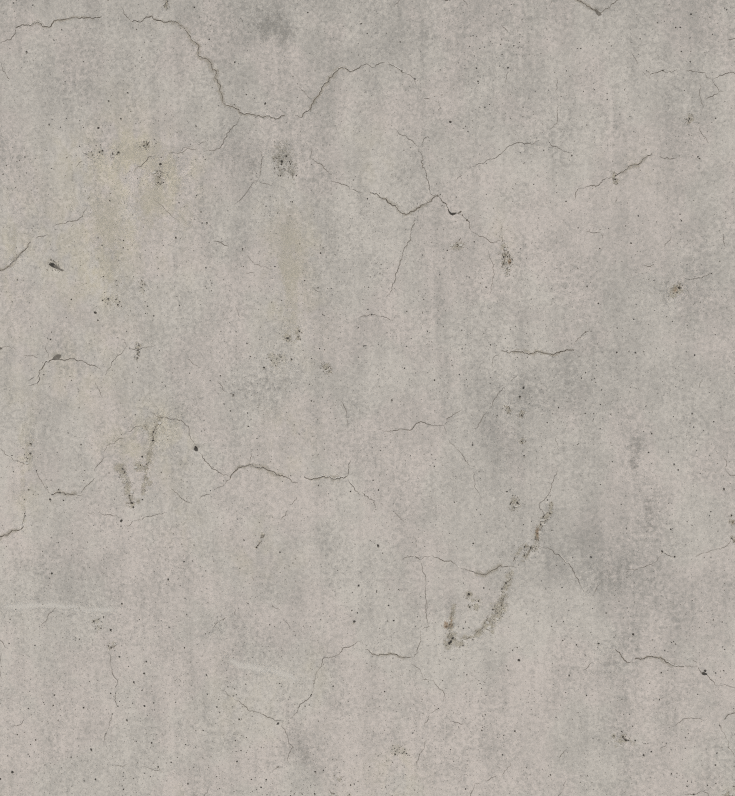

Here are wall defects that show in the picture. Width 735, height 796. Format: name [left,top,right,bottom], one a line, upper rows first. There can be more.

crack [3,0,440,153]
crack [0,215,83,271]
crack [310,134,502,297]
crack [575,153,674,201]
crack [25,339,155,395]
crack [2,426,166,526]
crack [156,416,404,522]
crack [222,546,514,768]
crack [610,647,728,686]